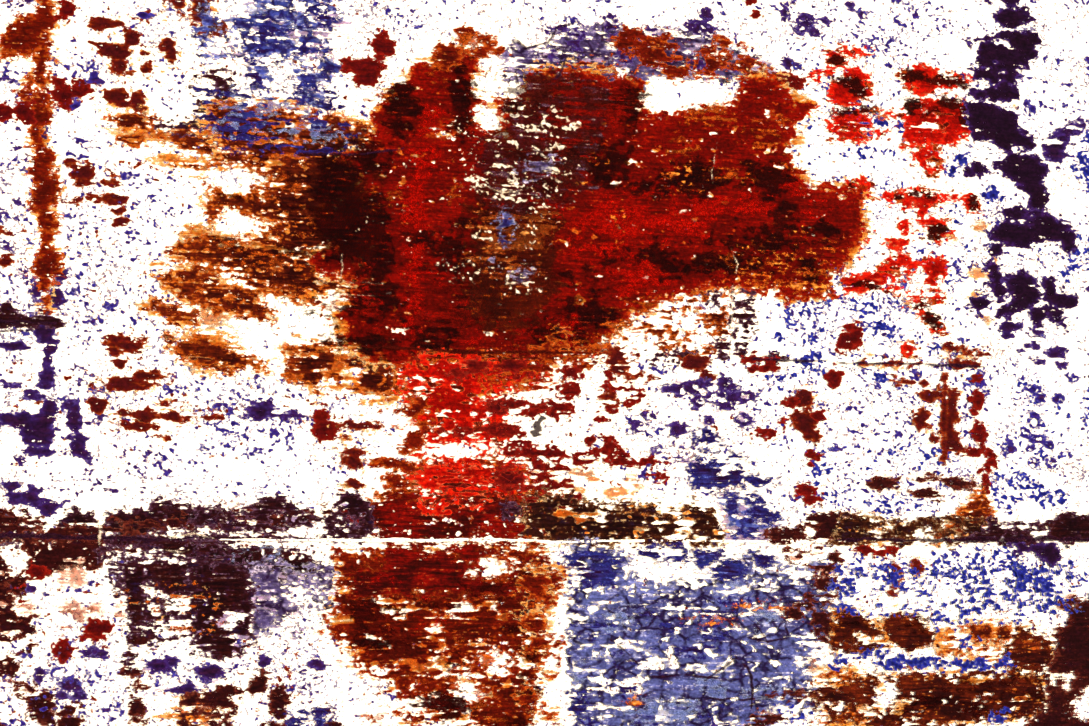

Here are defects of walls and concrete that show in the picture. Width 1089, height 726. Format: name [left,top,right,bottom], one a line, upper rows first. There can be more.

corrosion [756,351,790,368]
corrosion [820,362,845,389]
corrosion [788,384,824,446]
corrosion [271,638,323,709]
crack [611,612,795,709]